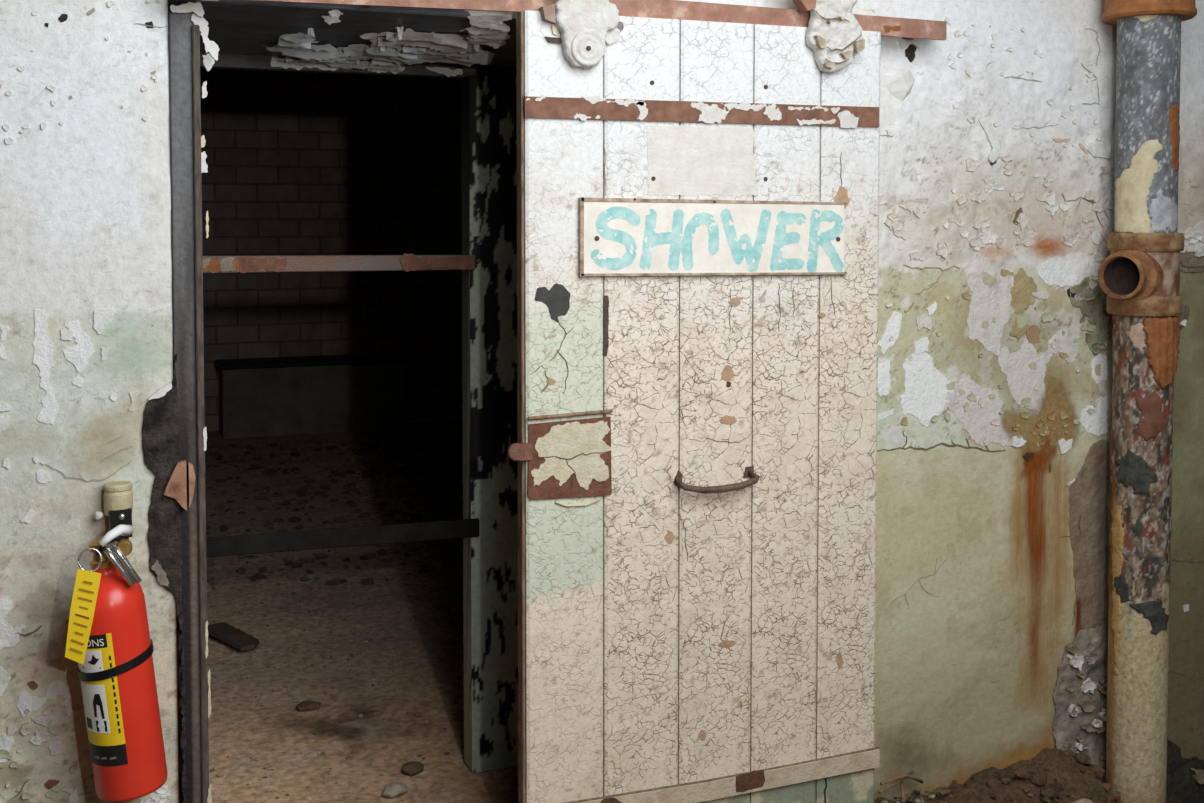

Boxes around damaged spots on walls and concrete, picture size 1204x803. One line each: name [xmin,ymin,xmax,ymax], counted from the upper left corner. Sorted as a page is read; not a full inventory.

peeling [266,10,512,77]
spalling [898,38,920,62]
peeling [535,284,570,322]
peeling [32,309,116,425]
crack [537,451,609,484]
crack [877,432,1006,452]
spalling [877,91,1114,783]
rust [1017,441,1055,577]
rust [1128,316,1180,446]
spalling [110,353,187,803]
rust [1110,505,1125,675]
peeling [0,680,79,803]